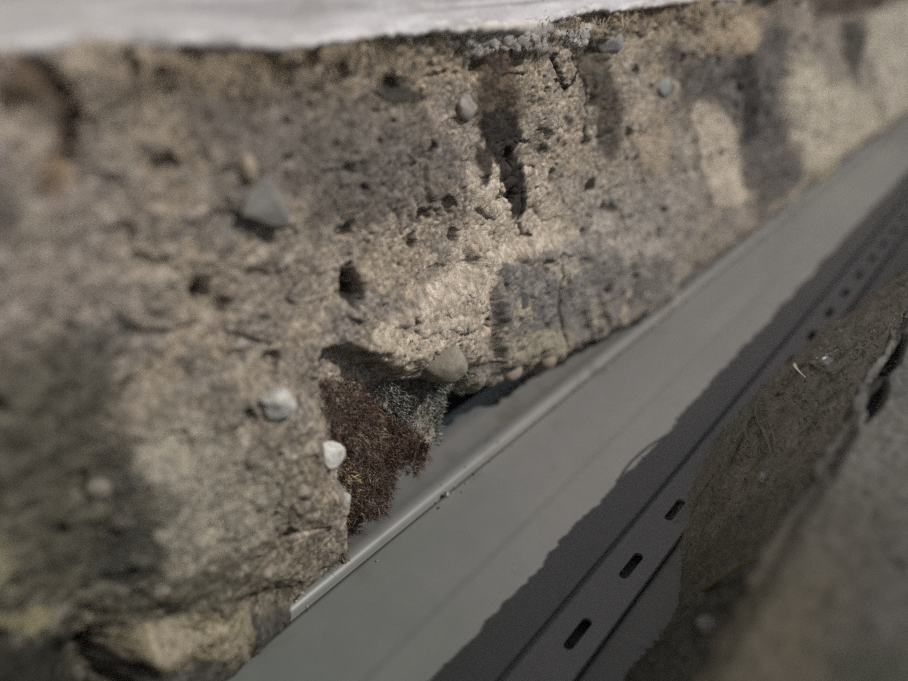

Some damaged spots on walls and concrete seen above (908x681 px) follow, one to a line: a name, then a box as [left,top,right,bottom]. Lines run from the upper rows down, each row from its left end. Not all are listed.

peeling [435,17,592,60]
spalling [699,9,764,55]
spalling [781,0,908,181]
spalling [584,177,596,191]
spalling [633,112,670,179]
spalling [689,102,749,212]
spalling [338,241,410,304]
spalling [364,144,580,374]
spalling [129,410,290,582]
spalling [0,606,53,638]
spalling [78,605,255,672]